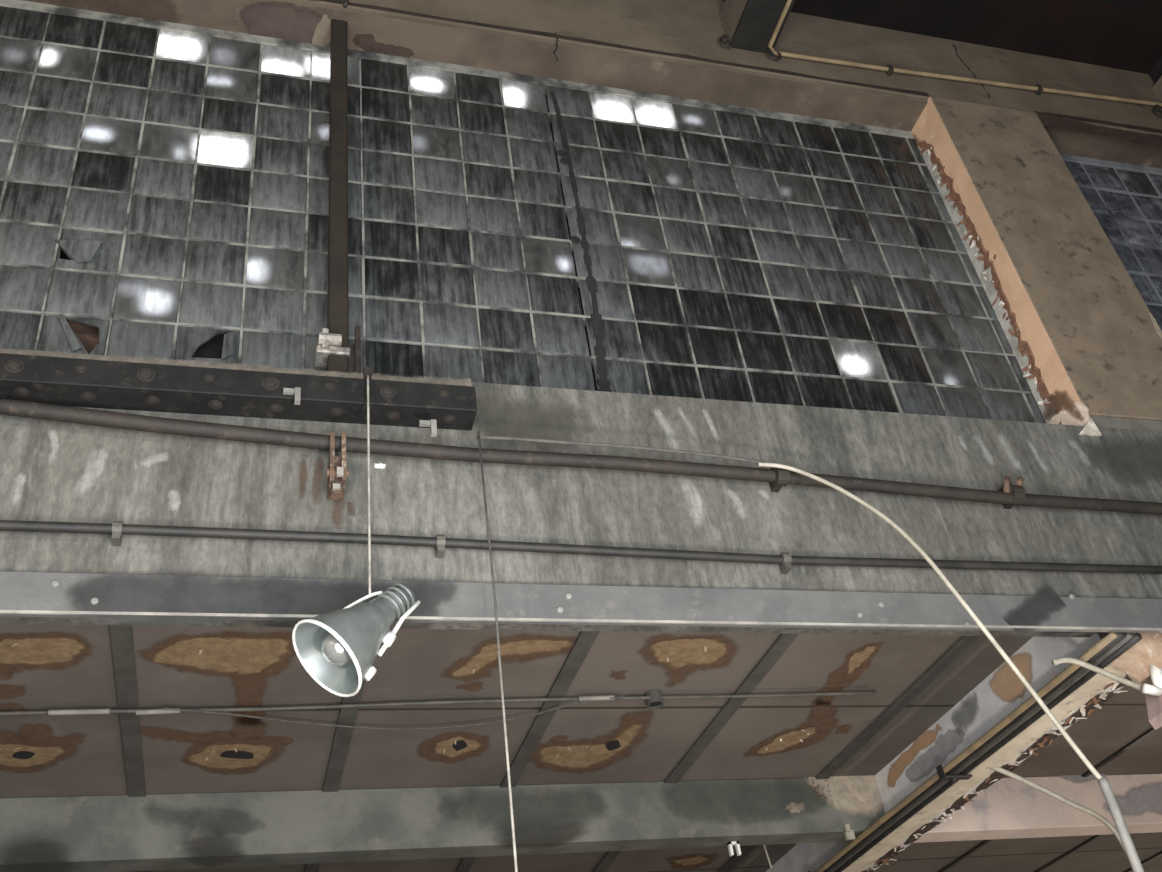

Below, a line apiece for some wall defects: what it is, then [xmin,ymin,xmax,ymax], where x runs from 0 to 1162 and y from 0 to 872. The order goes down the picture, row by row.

peeling [0,633,91,712]
peeling [73,574,453,774]
peeling [443,635,577,692]
peeling [640,635,737,686]
peeling [746,643,881,757]
peeling [989,653,1032,702]
peeling [529,712,652,772]
peeling [808,725,965,816]
peeling [862,675,1142,872]
peeling [1105,782,1162,815]
water stain [3,842,63,872]
water stain [502,825,582,847]